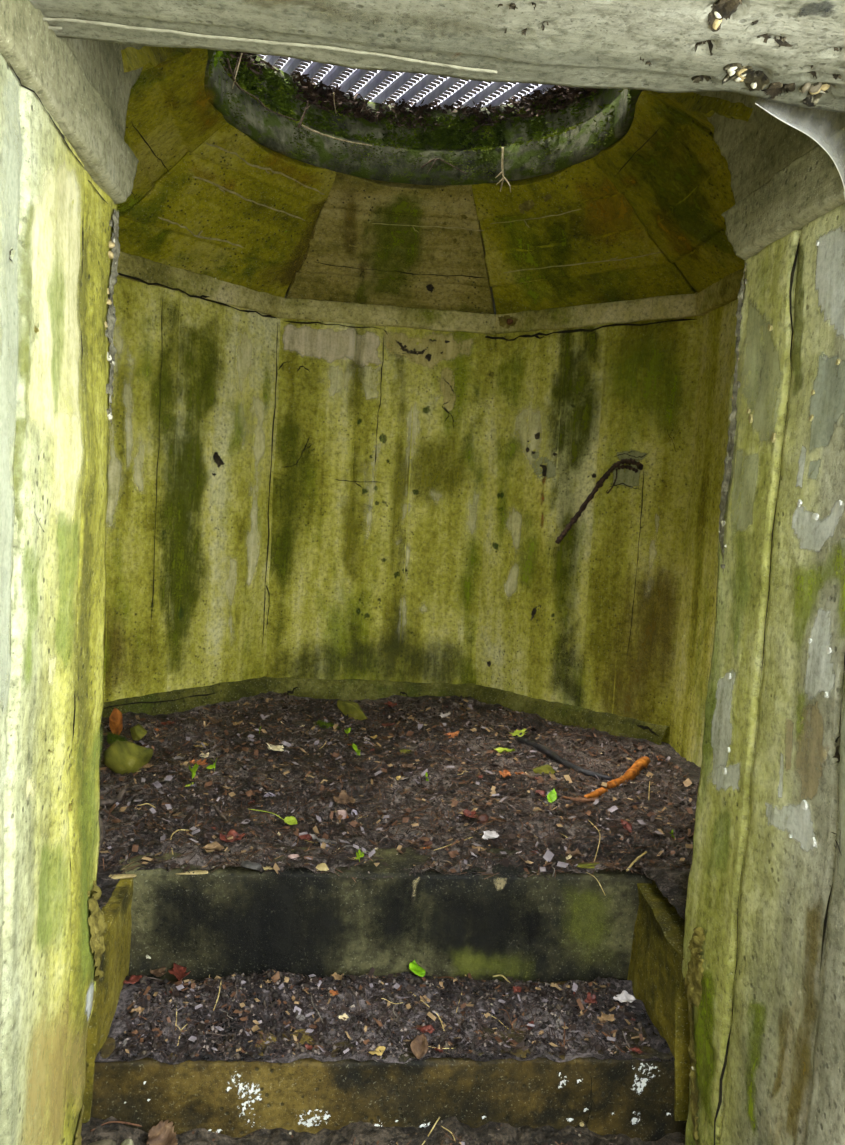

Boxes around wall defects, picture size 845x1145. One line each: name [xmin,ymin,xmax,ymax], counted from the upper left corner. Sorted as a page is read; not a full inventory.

spalling [708,0,742,32]
spalling [751,20,793,47]
spalling [691,63,842,107]
peeling [283,325,473,411]
leakage [553,328,598,406]
leakage [170,443,206,632]
leakage [553,632,581,706]
crack [714,237,800,1145]
peeling [711,671,740,791]
peeling [765,609,845,886]
leakage [225,1071,262,1127]
leakage [298,1109,331,1127]